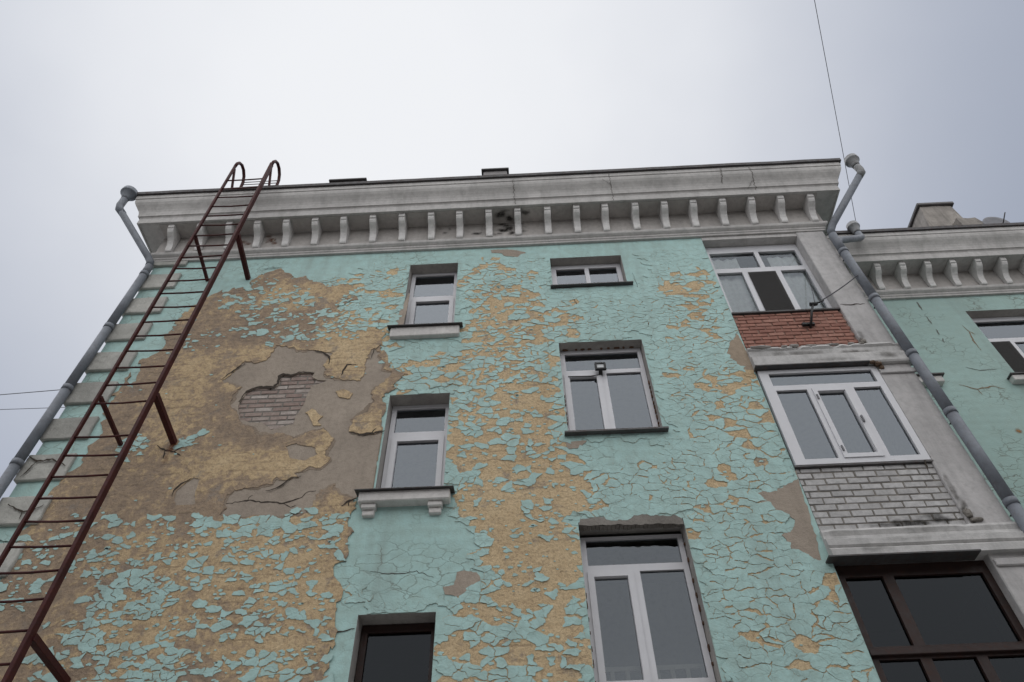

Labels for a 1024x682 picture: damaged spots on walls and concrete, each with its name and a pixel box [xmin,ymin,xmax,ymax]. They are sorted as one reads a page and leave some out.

crack [917,302,1004,394]
crack [226,476,309,508]
peeling [0,244,880,682]